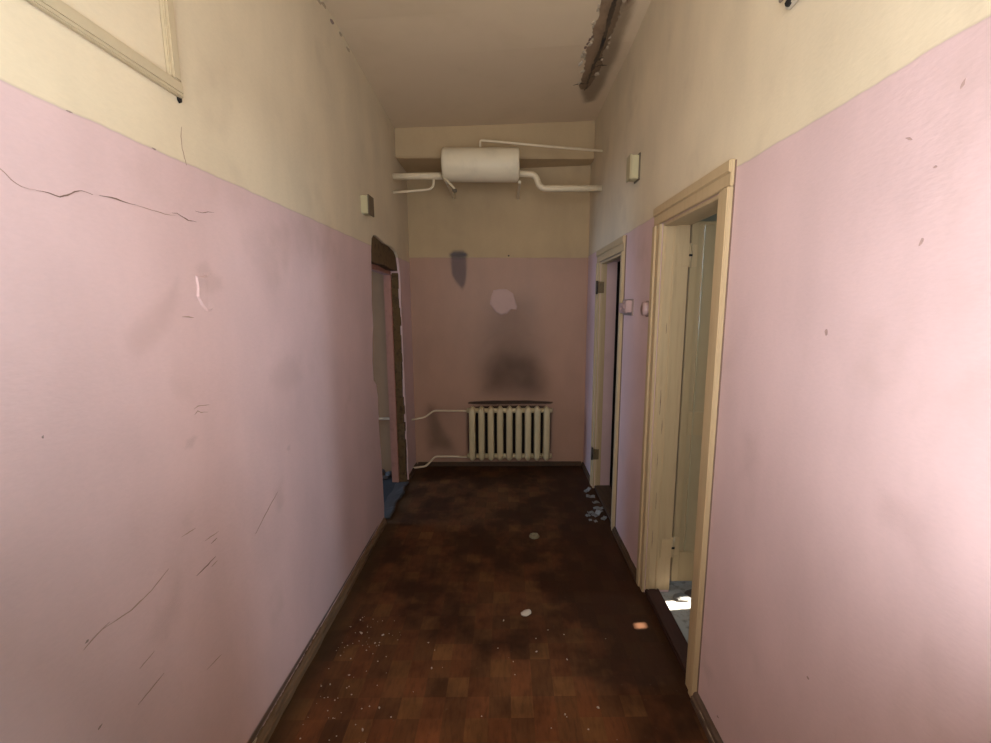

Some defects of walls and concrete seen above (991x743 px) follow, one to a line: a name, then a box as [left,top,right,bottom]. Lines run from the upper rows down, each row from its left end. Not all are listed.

flaking render [578,0,626,89]
crack [0,168,214,222]